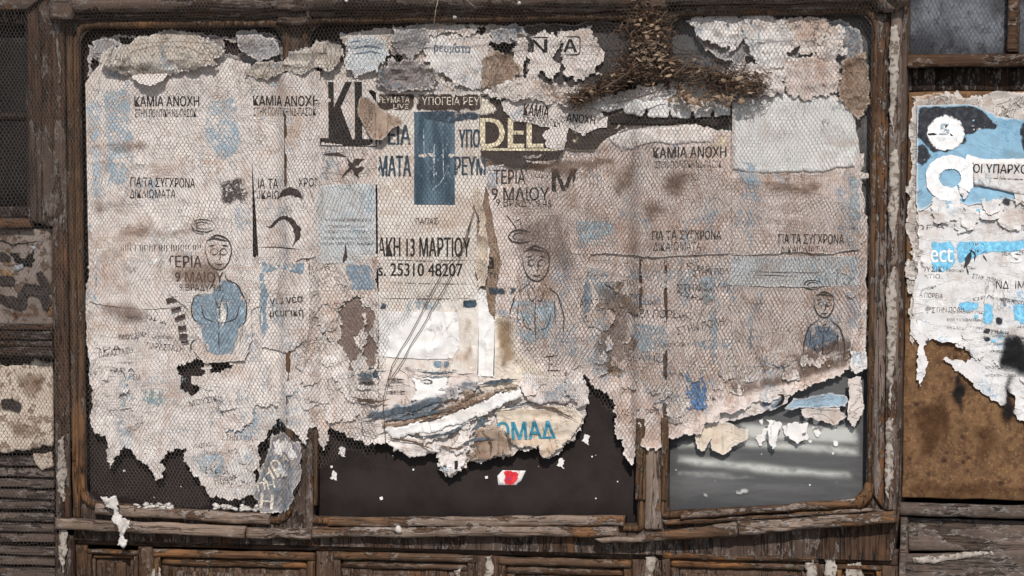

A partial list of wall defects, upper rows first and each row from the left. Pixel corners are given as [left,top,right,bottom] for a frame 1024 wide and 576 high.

peeling [0,358,68,501]
peeling [58,530,68,575]